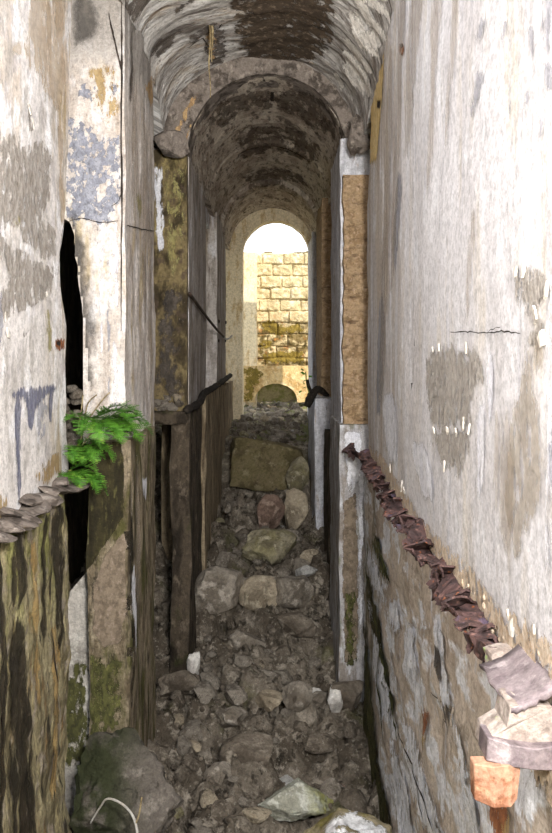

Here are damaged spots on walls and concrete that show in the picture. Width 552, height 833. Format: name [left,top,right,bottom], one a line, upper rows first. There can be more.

spalling [0,131,56,339]
leakage [156,289,182,404]
spalling [426,342,484,478]
crack [450,326,520,334]
spalling [513,260,549,350]
leakage [40,505,66,650]
leakage [0,531,36,833]